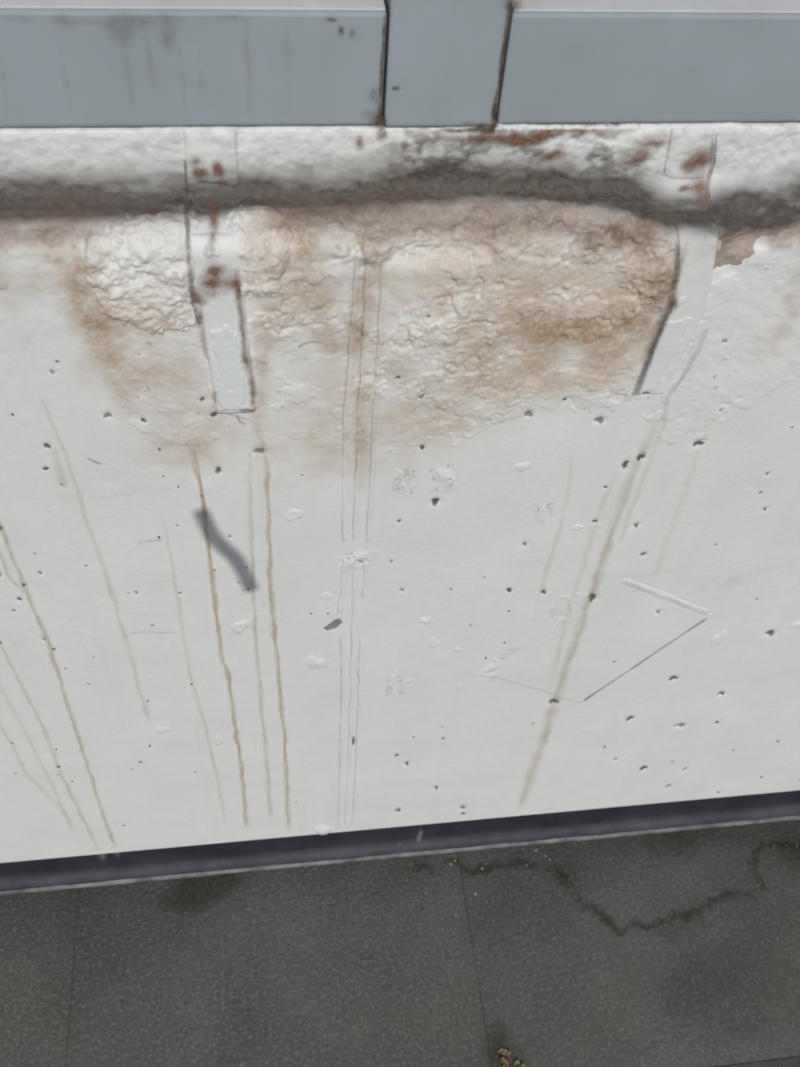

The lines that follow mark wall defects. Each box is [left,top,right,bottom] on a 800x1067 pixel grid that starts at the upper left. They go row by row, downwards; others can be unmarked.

corrosion [633,141,662,163]
corrosion [685,153,709,171]